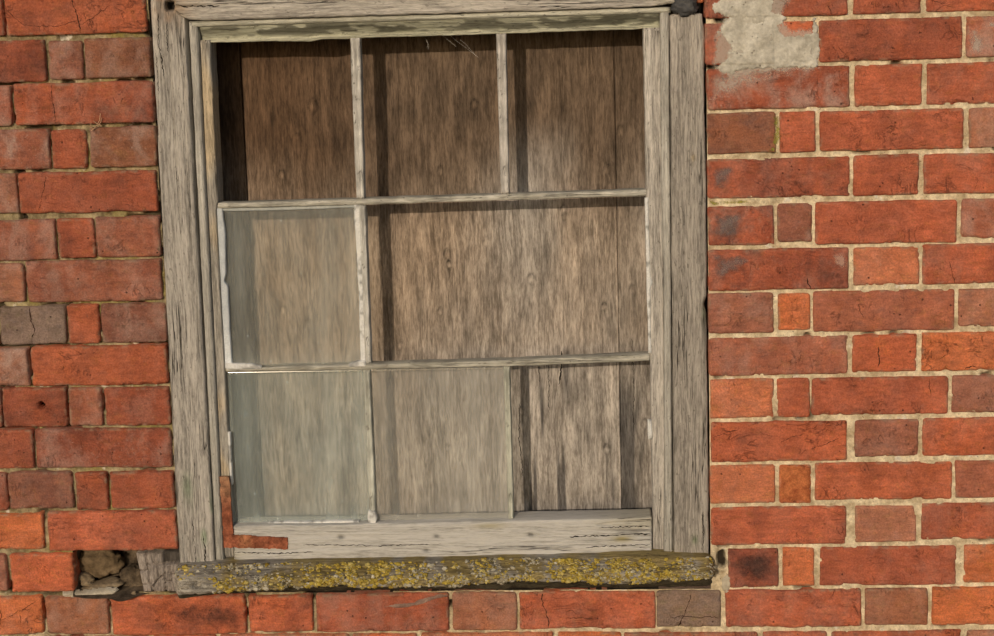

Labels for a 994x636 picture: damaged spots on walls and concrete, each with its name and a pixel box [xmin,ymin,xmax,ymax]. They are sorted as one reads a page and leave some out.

crack [672,595,717,626]